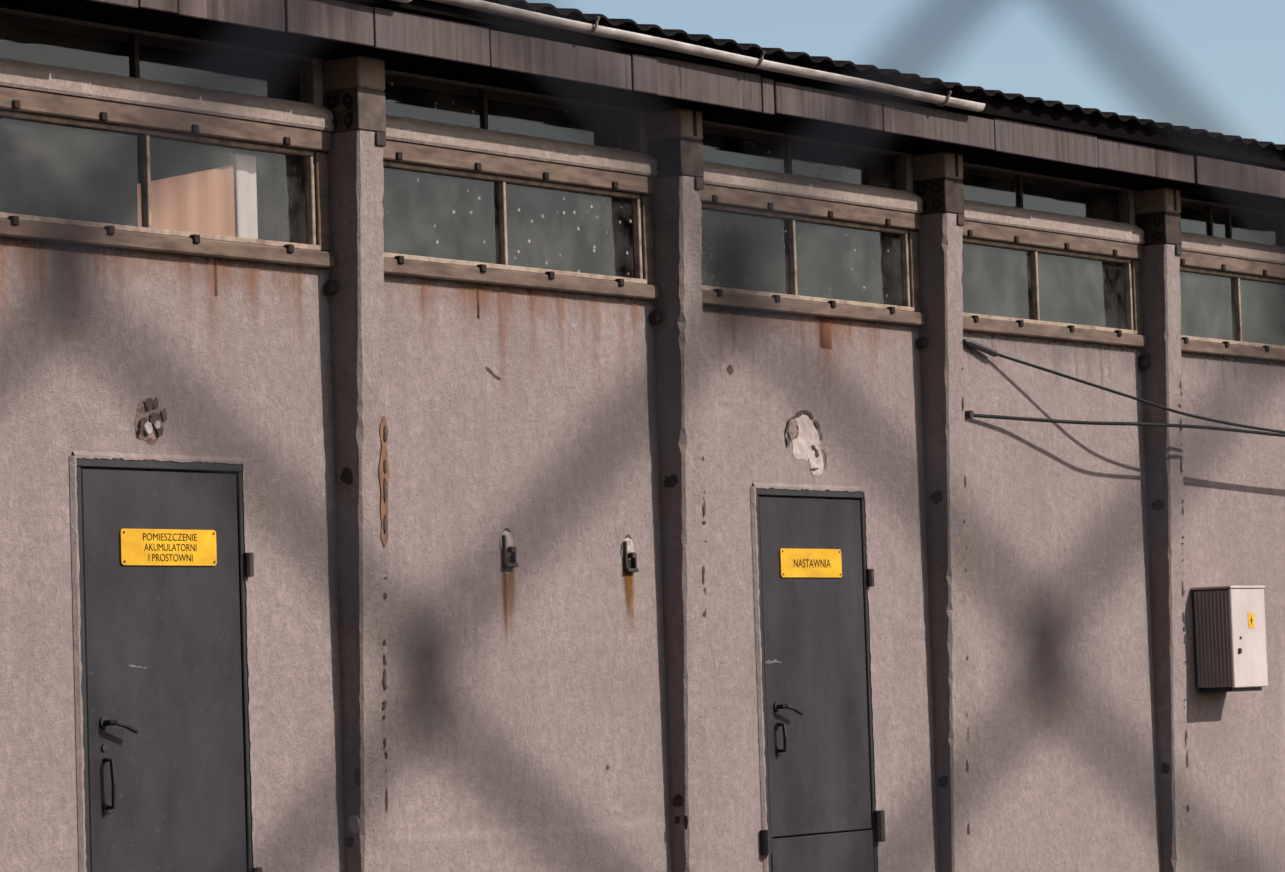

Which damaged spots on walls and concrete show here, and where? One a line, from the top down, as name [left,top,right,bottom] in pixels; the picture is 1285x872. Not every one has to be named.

spalling [135,399,167,444]
peeling [786,410,827,476]